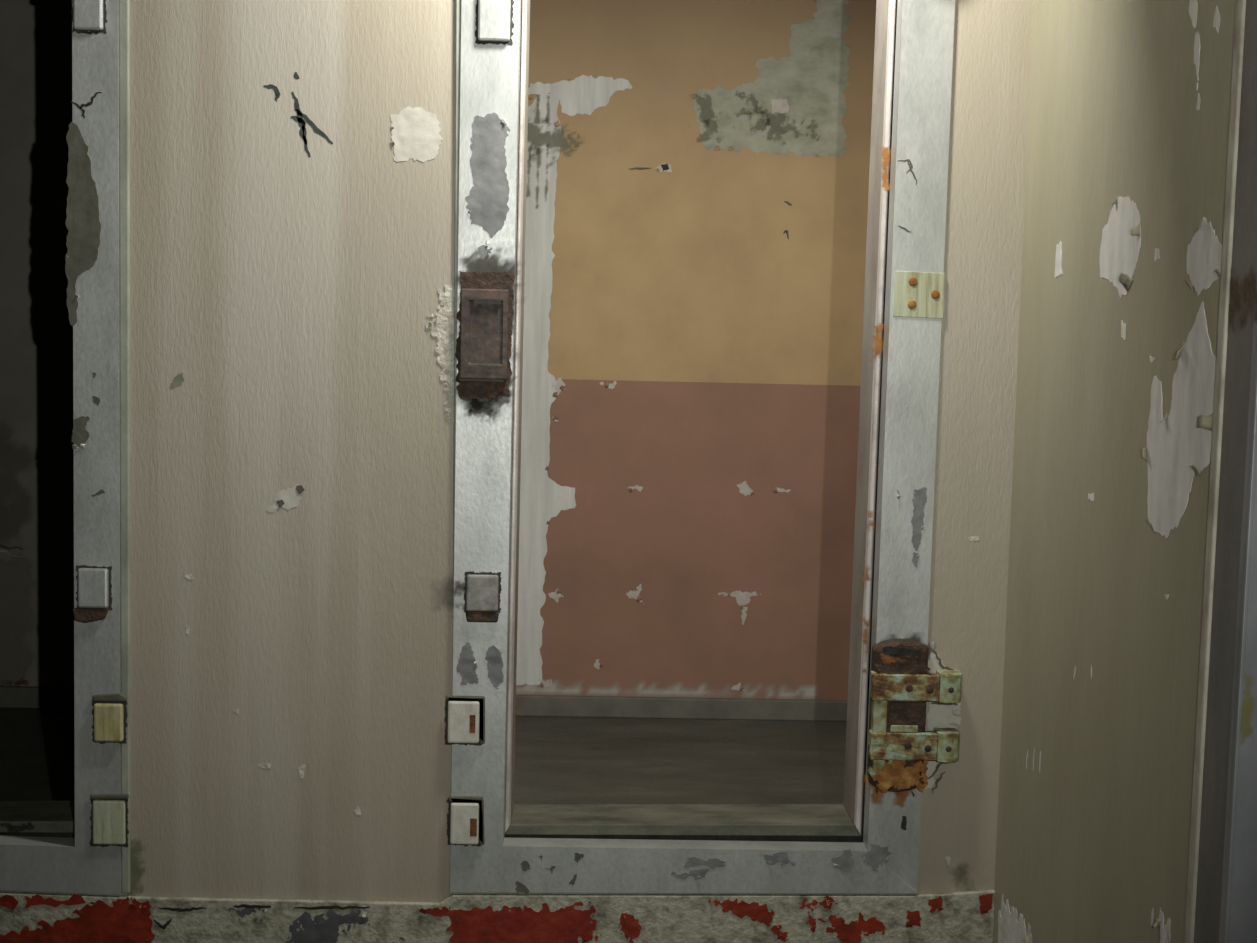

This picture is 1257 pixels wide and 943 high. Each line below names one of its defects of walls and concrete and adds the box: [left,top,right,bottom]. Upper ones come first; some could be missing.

peeling [692,0,852,157]
peeling [1189,0,1201,110]
peeling [1099,196,1160,298]
peeling [457,75,632,694]
peeling [1142,217,1223,538]
corrosion [865,775,912,806]
peeling [0,894,156,943]
peeling [284,909,370,943]
peeling [419,853,598,943]
peeling [619,913,641,943]
peeling [708,898,789,942]
peeling [799,895,943,943]